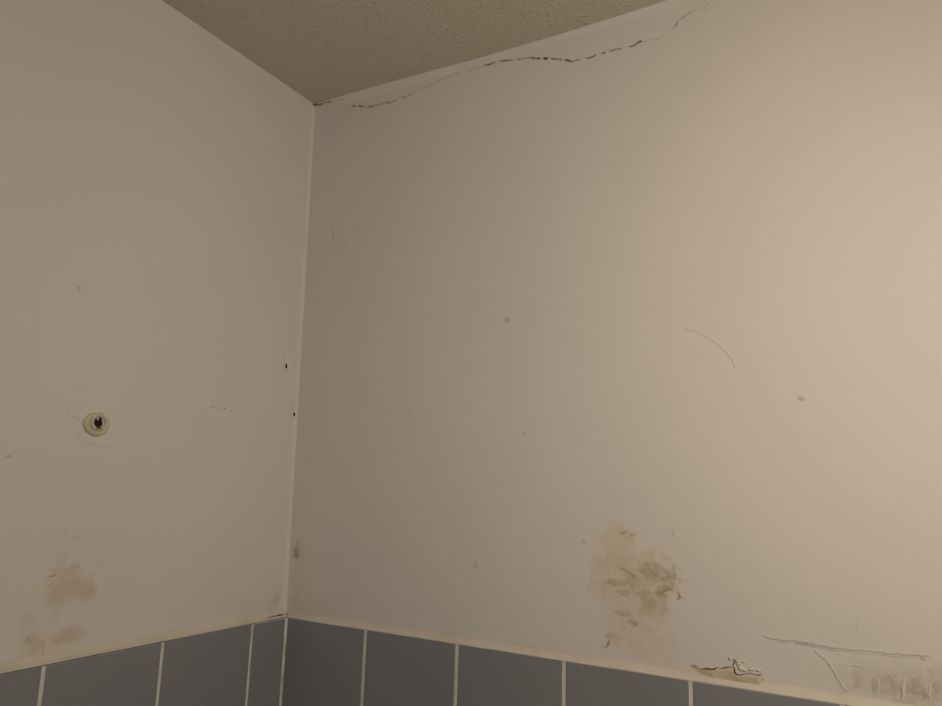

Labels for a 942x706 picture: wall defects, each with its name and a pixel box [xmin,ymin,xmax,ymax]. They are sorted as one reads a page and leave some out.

crack [313,40,646,107]